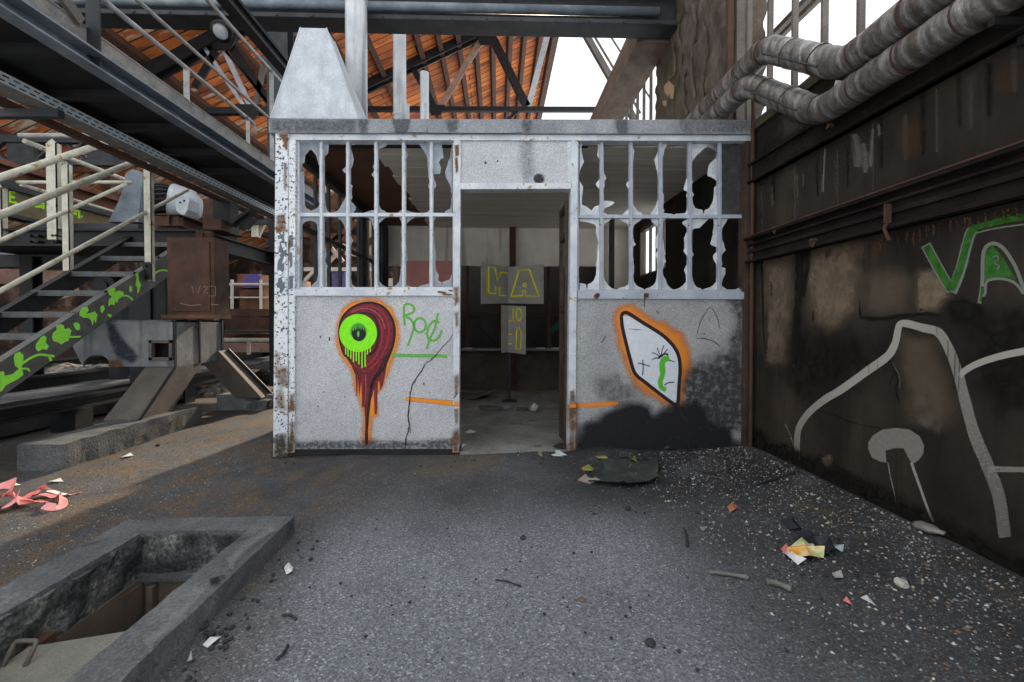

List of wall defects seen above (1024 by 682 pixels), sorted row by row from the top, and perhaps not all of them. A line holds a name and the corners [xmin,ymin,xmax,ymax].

corrosion [277,215,290,261]
corrosion [743,139,1024,239]
crack [404,335,453,449]